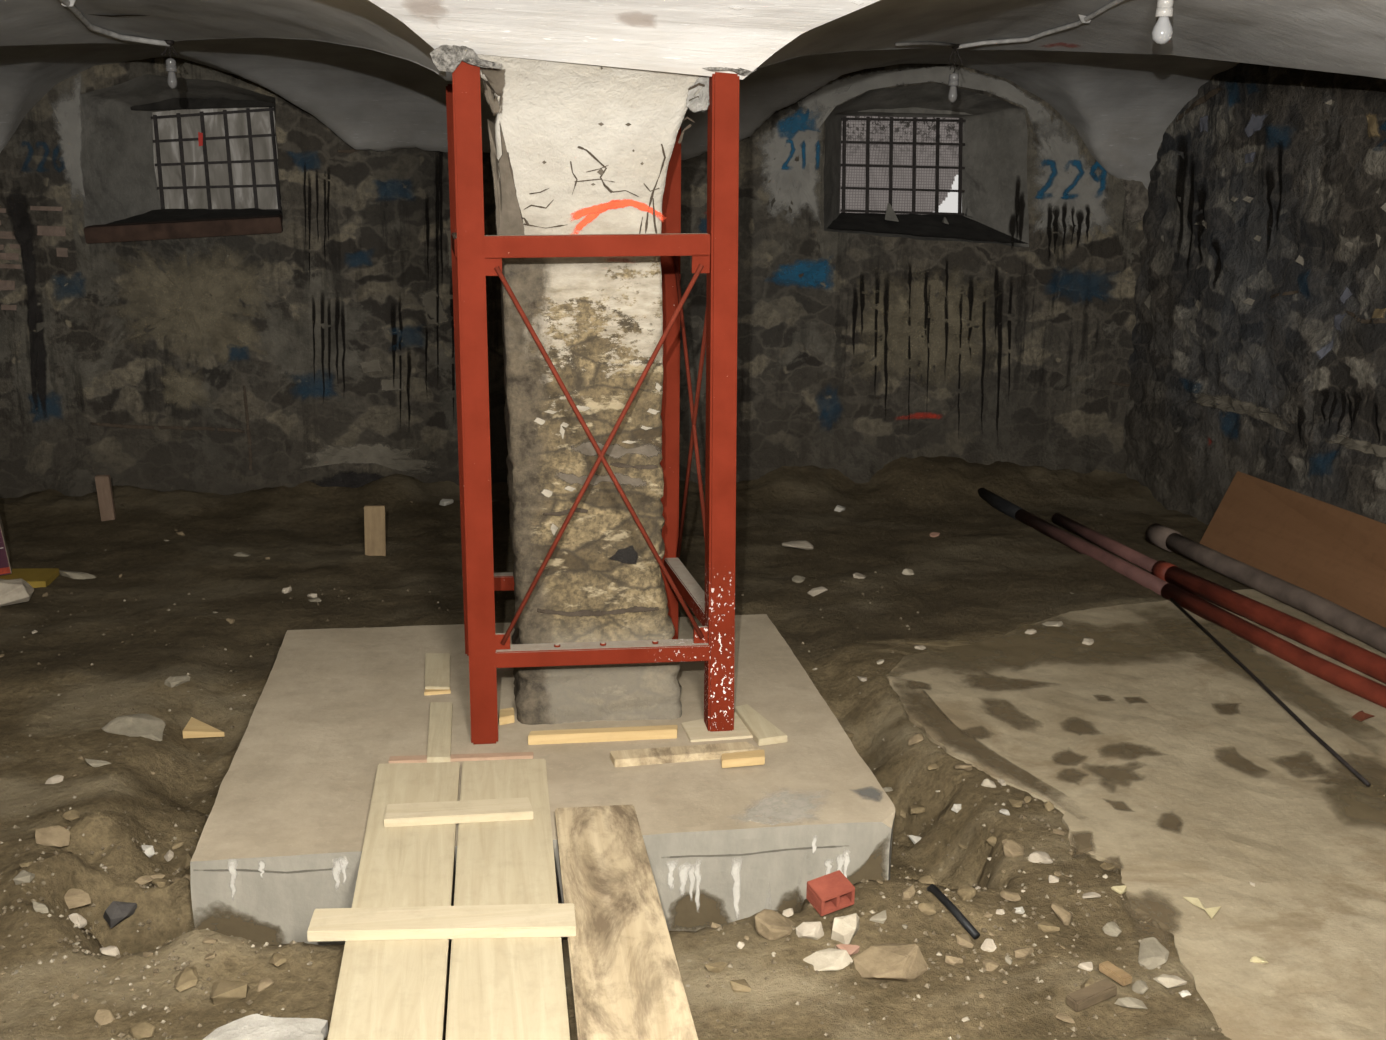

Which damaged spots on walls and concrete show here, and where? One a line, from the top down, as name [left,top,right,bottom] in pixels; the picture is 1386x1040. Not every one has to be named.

damp [303,167,331,281]
flaking render [430,45,524,235]
crack [507,144,666,234]
damp [1047,203,1090,258]
damp [8,190,47,412]
damp [312,294,346,397]
damp [852,272,890,418]
damp [908,259,1013,435]
damp [332,858,348,888]
damp [668,860,742,932]
damp [777,890,803,913]
damp [812,837,887,885]